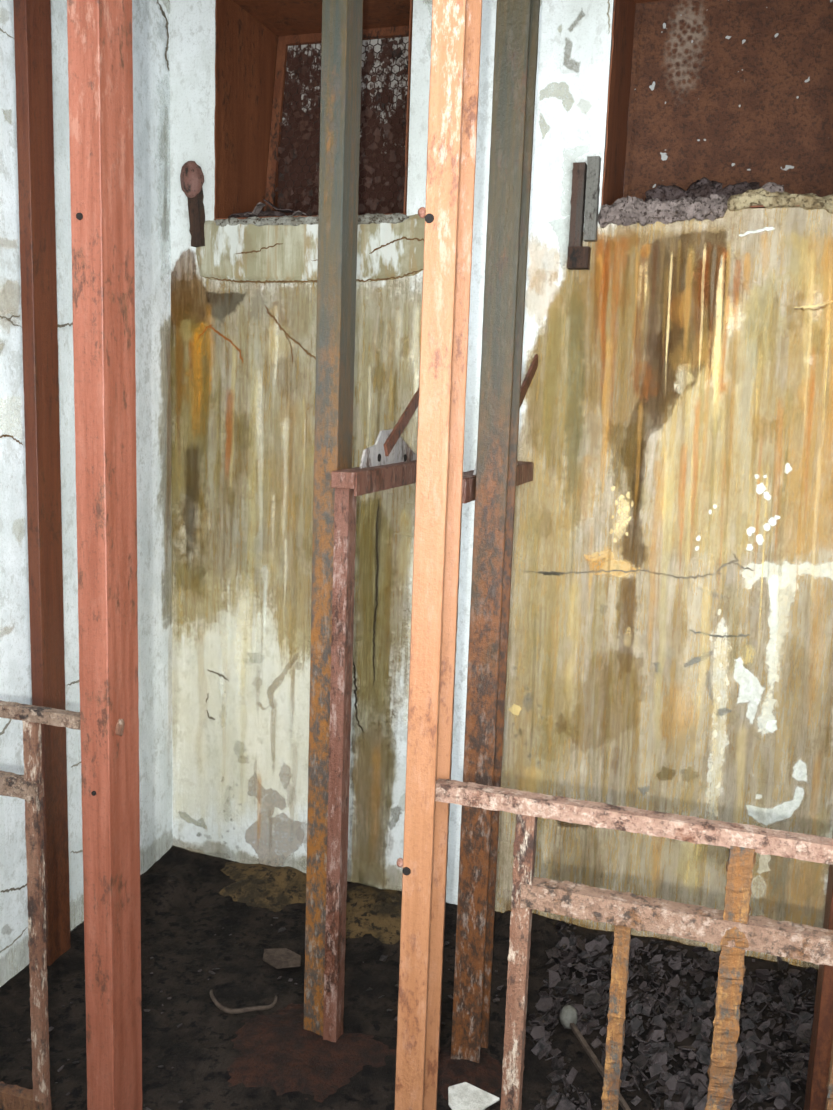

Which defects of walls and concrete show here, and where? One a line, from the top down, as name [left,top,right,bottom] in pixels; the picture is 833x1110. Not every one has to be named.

peeling [559,12,585,72]
peeling [540,82,573,111]
peeling [727,182,833,213]
peeling [552,217,570,264]
crack [0,315,22,328]
leakage [352,275,423,468]
leakage [161,277,317,660]
leakage [501,207,833,837]
crack [518,554,754,579]
leakage [349,483,416,891]
crack [1,884,27,893]
crack [0,927,28,953]